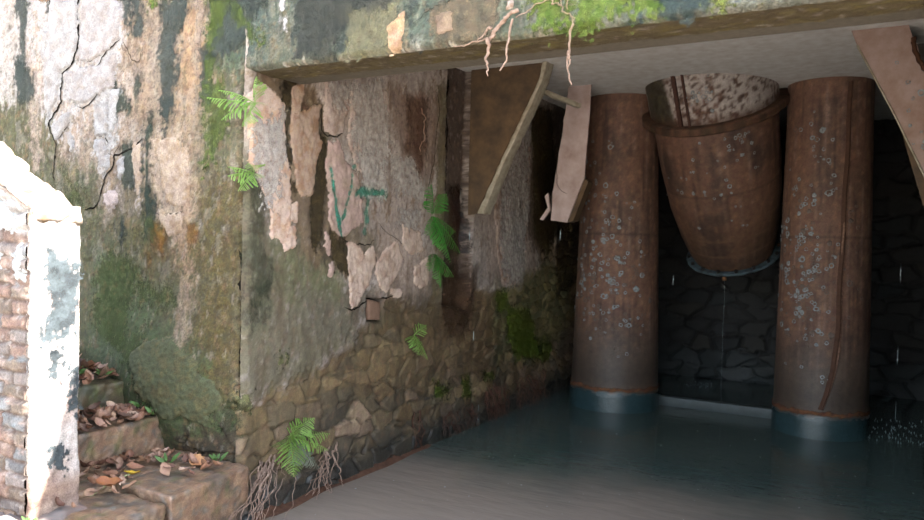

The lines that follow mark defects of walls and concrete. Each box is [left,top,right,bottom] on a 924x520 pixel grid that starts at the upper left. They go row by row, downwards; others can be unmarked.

peeling [0,196,32,283]
damp [13,0,34,106]
crack [48,0,143,179]
peeling [39,0,190,237]
crack [85,133,144,210]
damp [120,0,268,237]
peeling [243,80,430,309]
crack [321,104,357,172]
spalling [292,0,405,64]
crack [426,78,452,205]
damp [35,245,84,419]
damp [46,443,70,477]